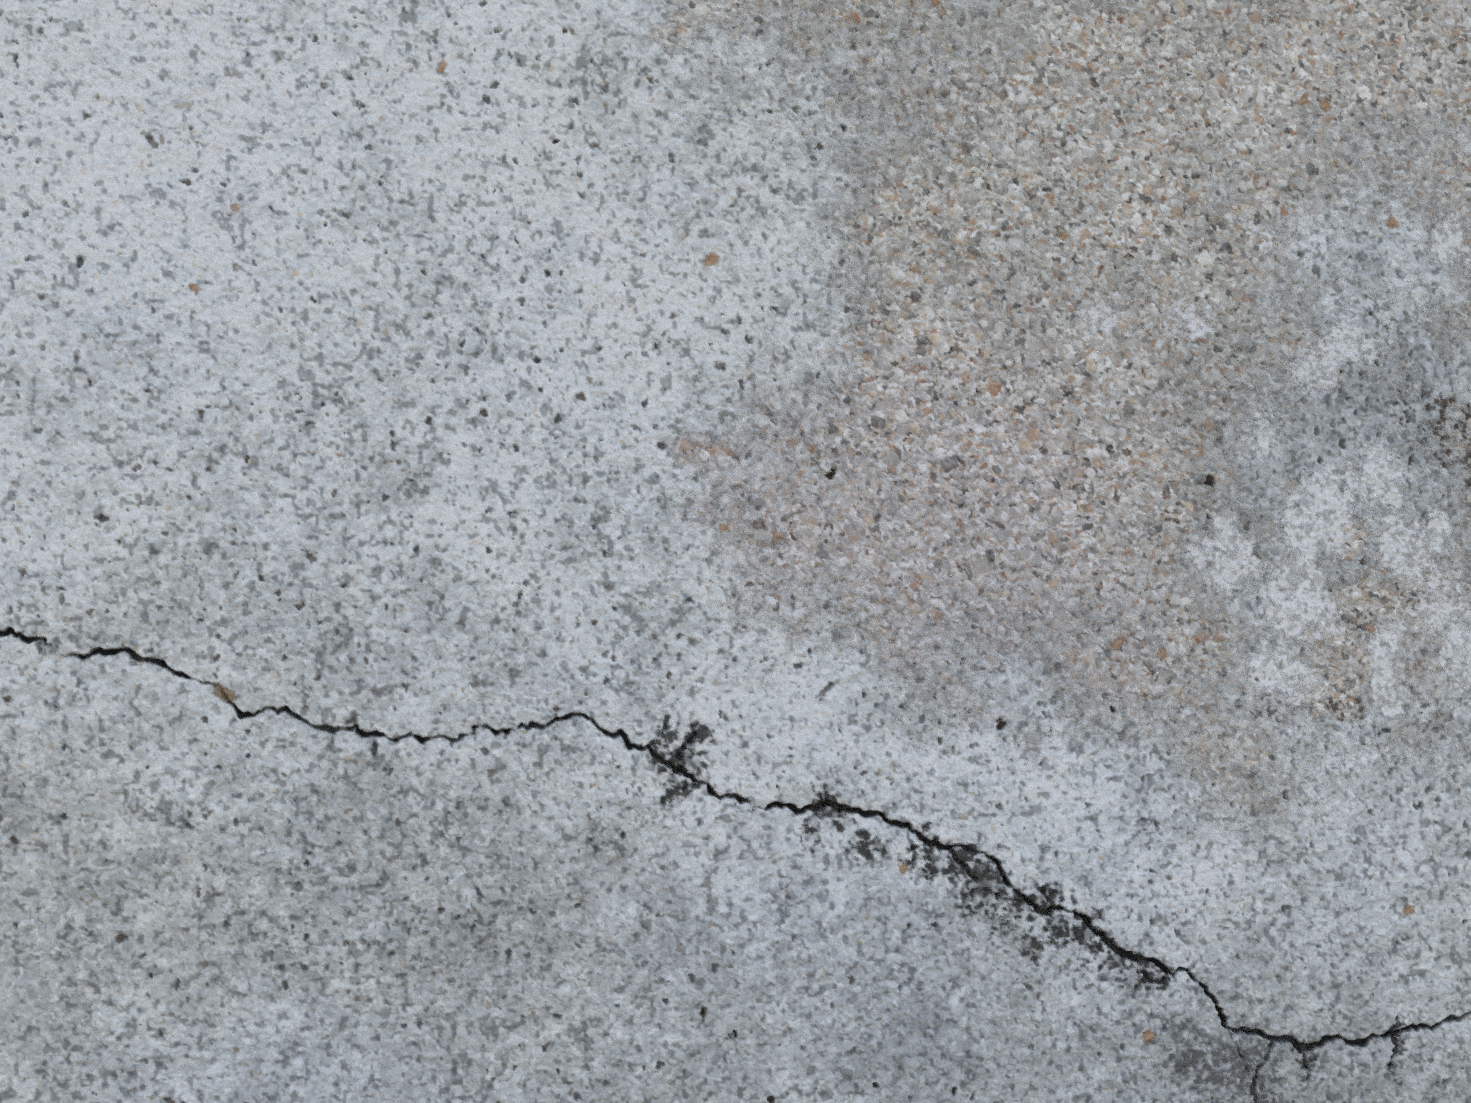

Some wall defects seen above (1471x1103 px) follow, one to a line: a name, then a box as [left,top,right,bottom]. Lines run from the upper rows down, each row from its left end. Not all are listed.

crack [0,627,1471,1095]